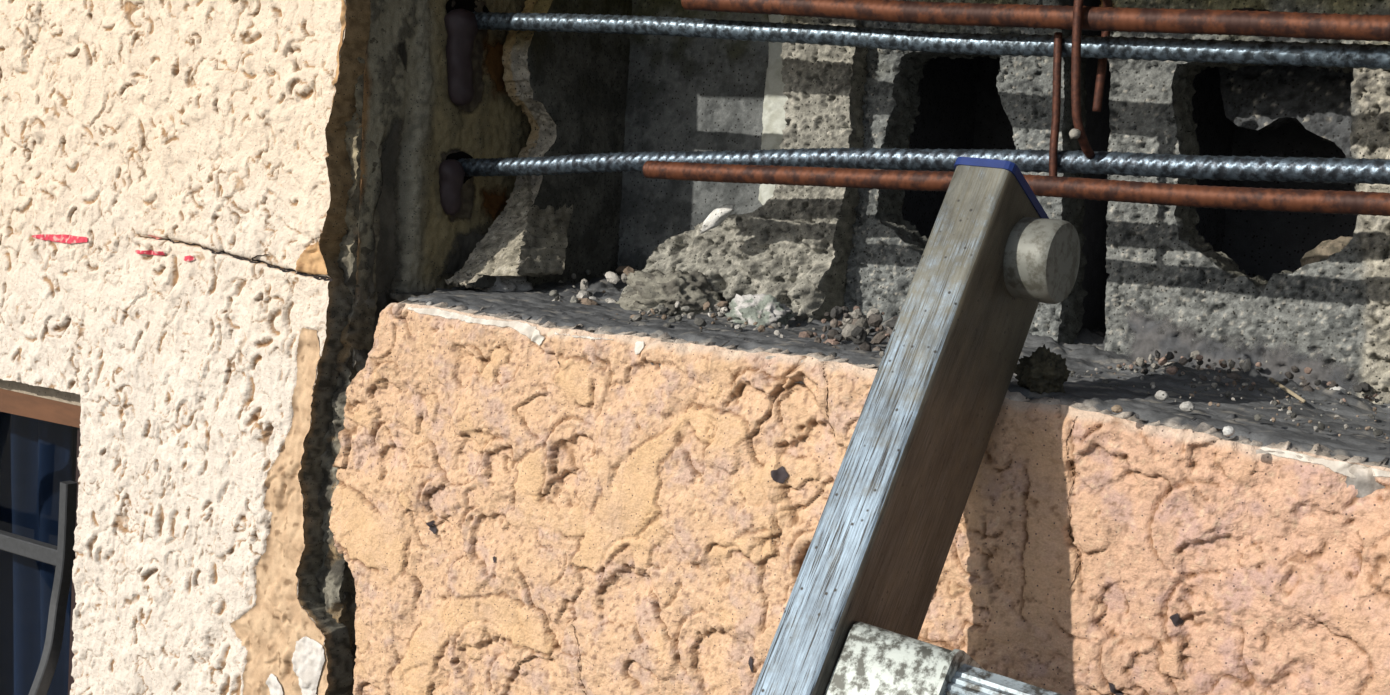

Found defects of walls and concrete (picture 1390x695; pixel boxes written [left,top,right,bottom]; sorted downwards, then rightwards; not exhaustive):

spalling [457,0,1390,280]
crack [139,236,333,282]
spalling [407,307,613,345]
peeling [230,328,328,695]
crack [1066,418,1081,588]